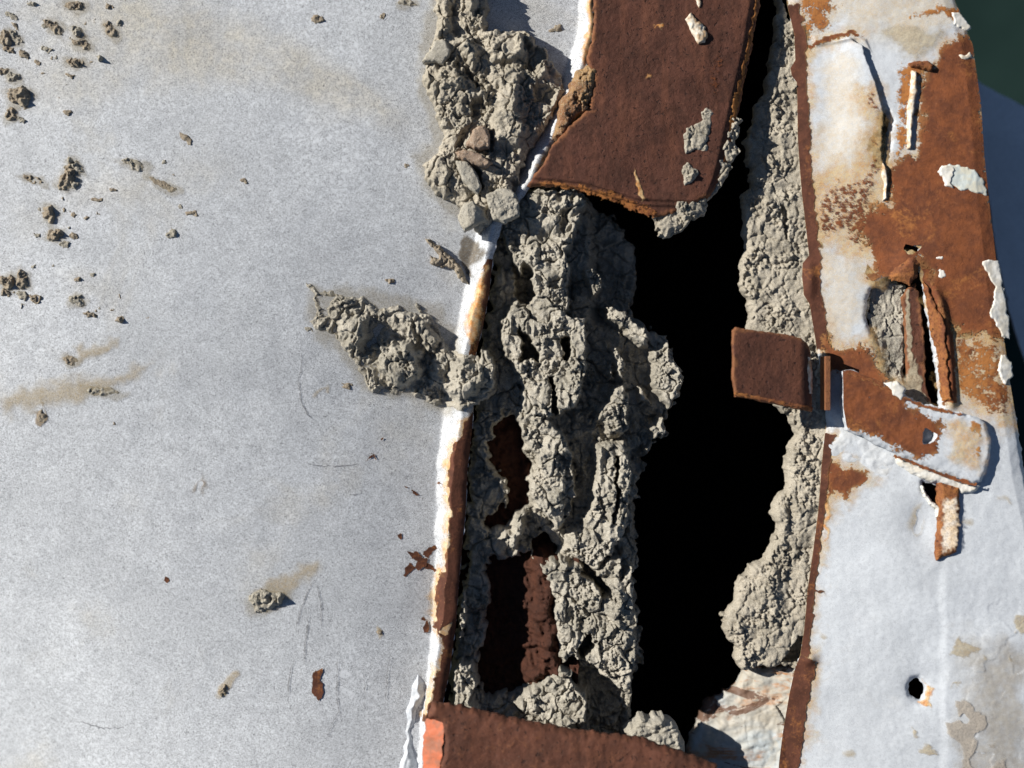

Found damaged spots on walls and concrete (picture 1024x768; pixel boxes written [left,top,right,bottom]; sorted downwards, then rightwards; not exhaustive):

corrosion [536,0,657,219]
corrosion [726,0,758,142]
corrosion [734,392,813,411]
corrosion [787,0,1013,486]
peeling [938,164,987,196]
peeling [982,259,1010,339]
corrosion [421,413,473,722]
corrosion [779,433,869,768]